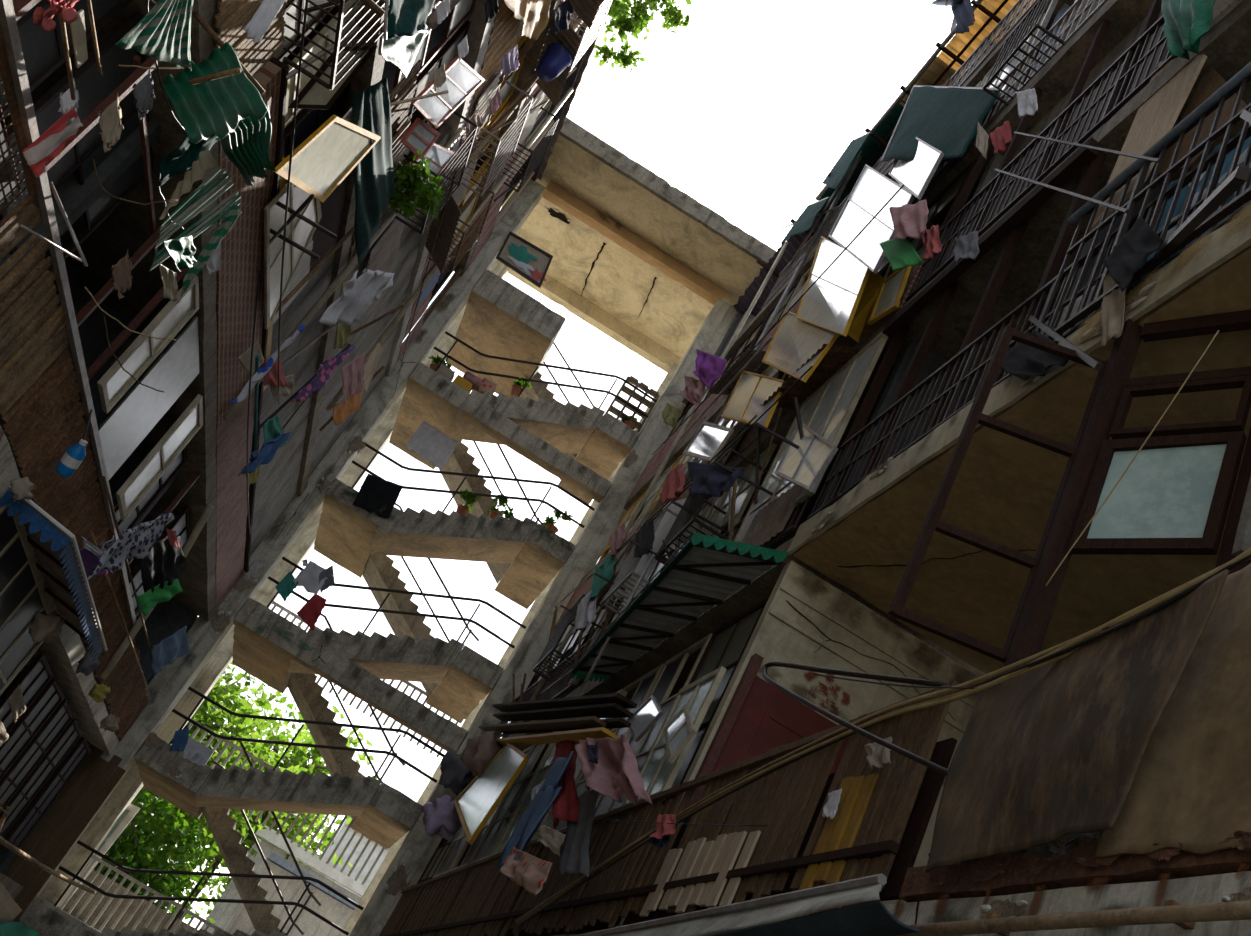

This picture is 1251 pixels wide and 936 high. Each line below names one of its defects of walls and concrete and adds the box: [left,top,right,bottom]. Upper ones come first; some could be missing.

crack [581,242,606,296]
crack [837,550,984,568]
crack [787,601,920,694]